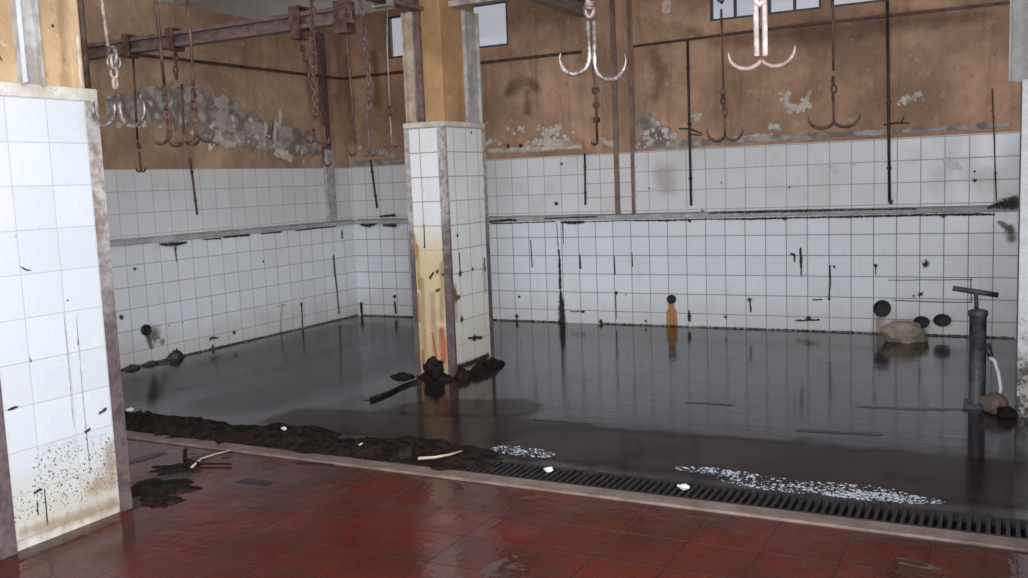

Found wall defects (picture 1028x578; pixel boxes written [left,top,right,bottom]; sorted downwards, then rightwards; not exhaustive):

peeling [778,89,812,114]
peeling [897,91,923,106]
peeling [99,82,322,163]
peeling [485,123,583,154]
peeling [635,112,1012,149]